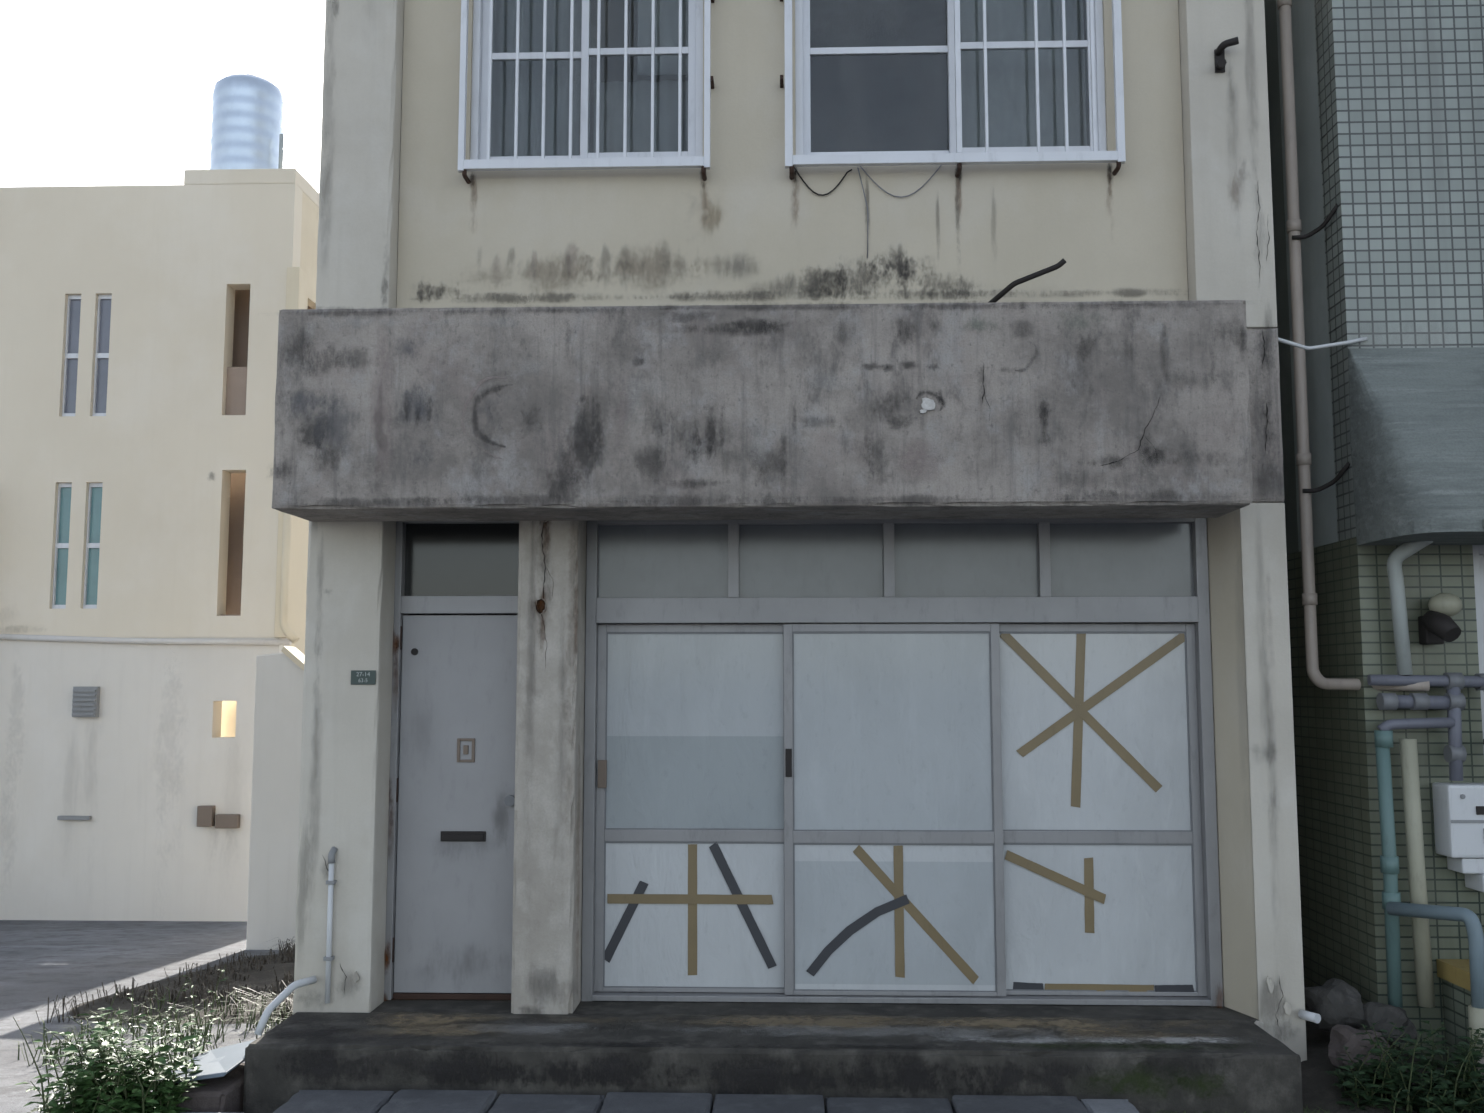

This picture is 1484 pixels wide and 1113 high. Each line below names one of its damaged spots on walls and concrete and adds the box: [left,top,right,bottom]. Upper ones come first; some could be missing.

water stain [887,254,914,277]
spalling [916,392,944,414]